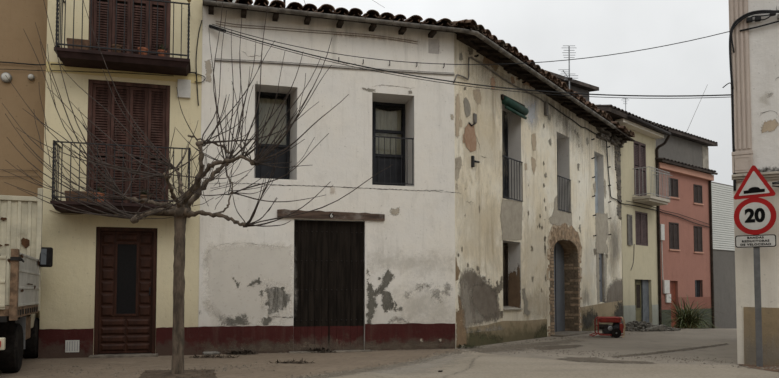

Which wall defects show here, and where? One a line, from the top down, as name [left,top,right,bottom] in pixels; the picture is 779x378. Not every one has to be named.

spalling [451,87,481,151]
flaking render [761,119,778,133]
flaking render [232,277,293,325]
flaking render [366,270,402,324]
flaking render [456,295,466,348]